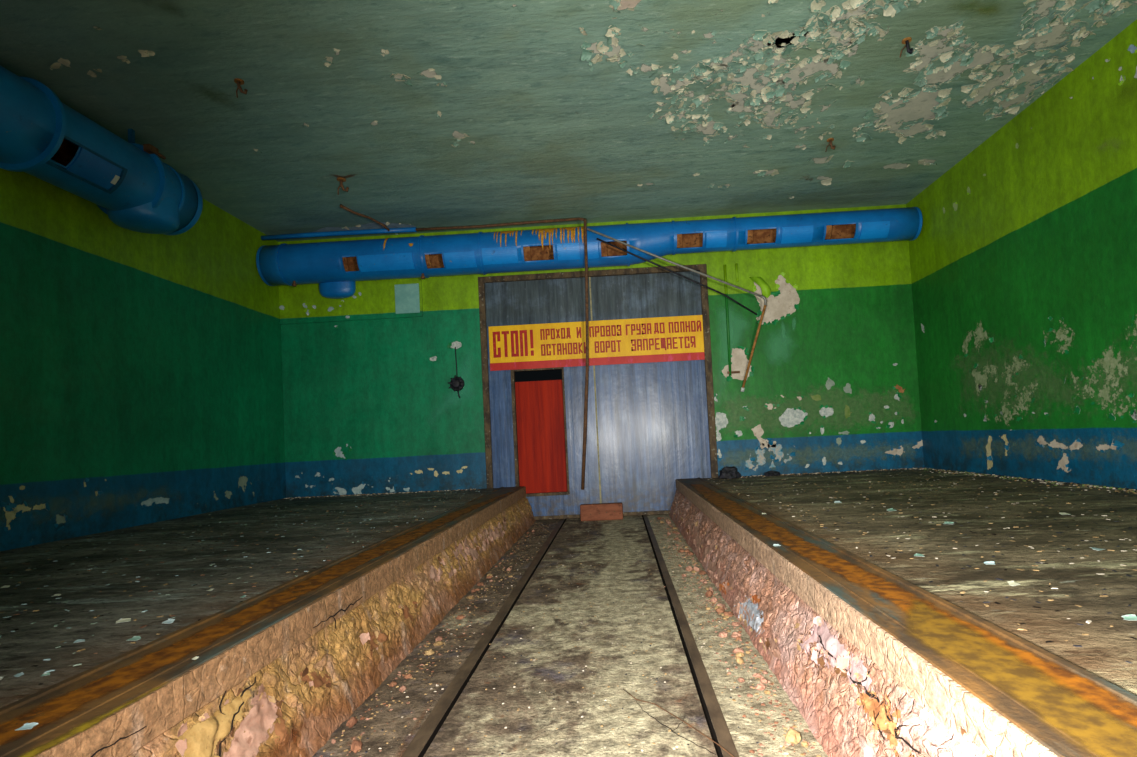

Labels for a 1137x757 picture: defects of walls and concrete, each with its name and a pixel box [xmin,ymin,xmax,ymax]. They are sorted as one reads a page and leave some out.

peeling [579,0,927,186]
peeling [852,0,1137,144]
rust [494,226,584,248]
peeling [749,272,800,325]
peeling [721,346,754,382]
flaking render [765,377,866,446]
peeling [962,320,1049,469]
peeling [1034,435,1124,472]
crack [313,597,362,629]
crack [91,726,147,757]
crack [219,676,256,757]
crack [818,635,925,757]